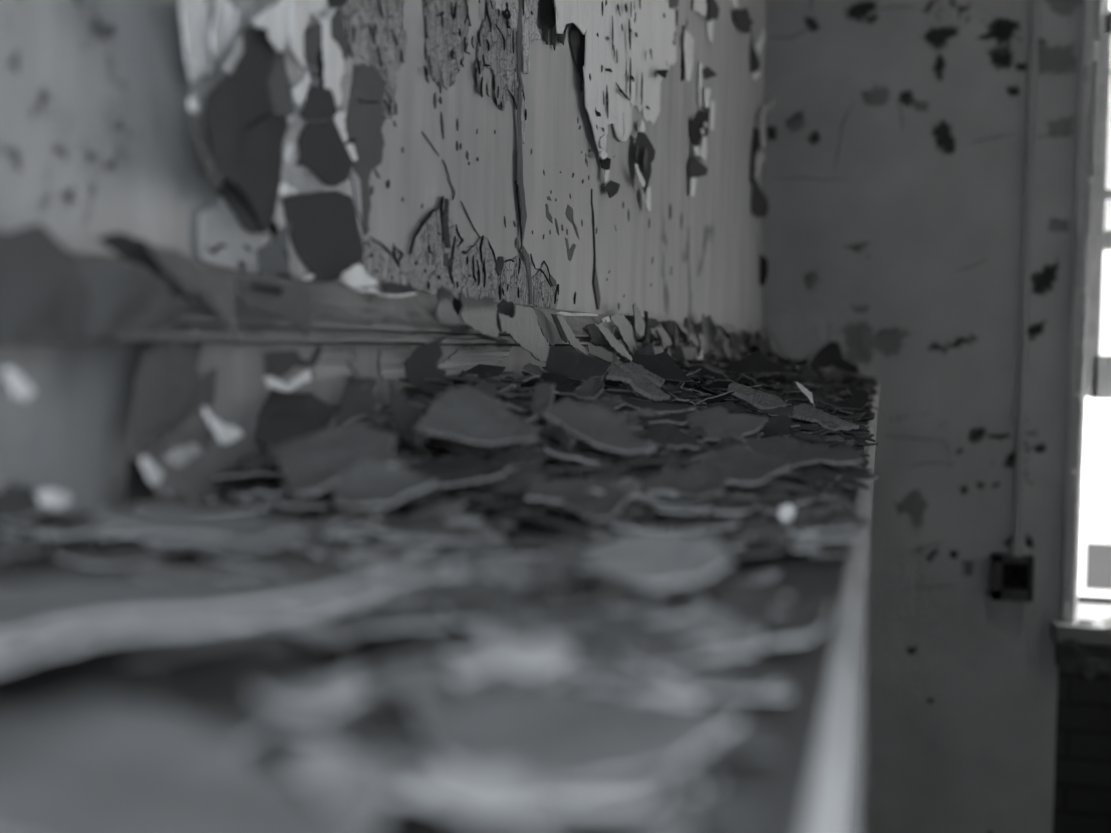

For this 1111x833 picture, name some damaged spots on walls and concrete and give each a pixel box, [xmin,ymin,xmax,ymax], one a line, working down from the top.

peeling [965,0,1017,21]